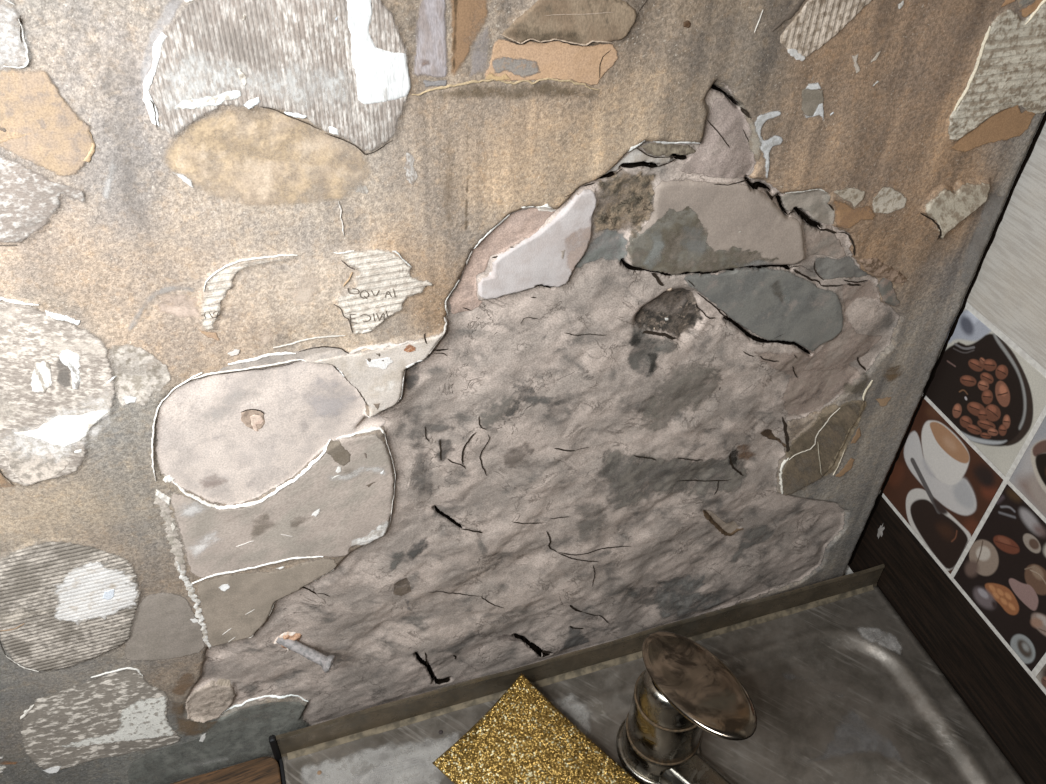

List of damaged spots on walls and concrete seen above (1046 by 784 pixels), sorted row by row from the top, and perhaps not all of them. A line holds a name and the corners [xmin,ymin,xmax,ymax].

peeling [485,0,647,85]
peeling [174,67,260,109]
peeling [926,182,990,239]
peeling [31,349,81,393]
peeling [4,410,110,485]
crack [425,418,490,476]
spalling [151,82,907,742]
crack [782,417,790,452]
crack [434,506,482,533]
crack [514,516,629,587]
crack [415,652,456,684]
crack [504,633,551,657]